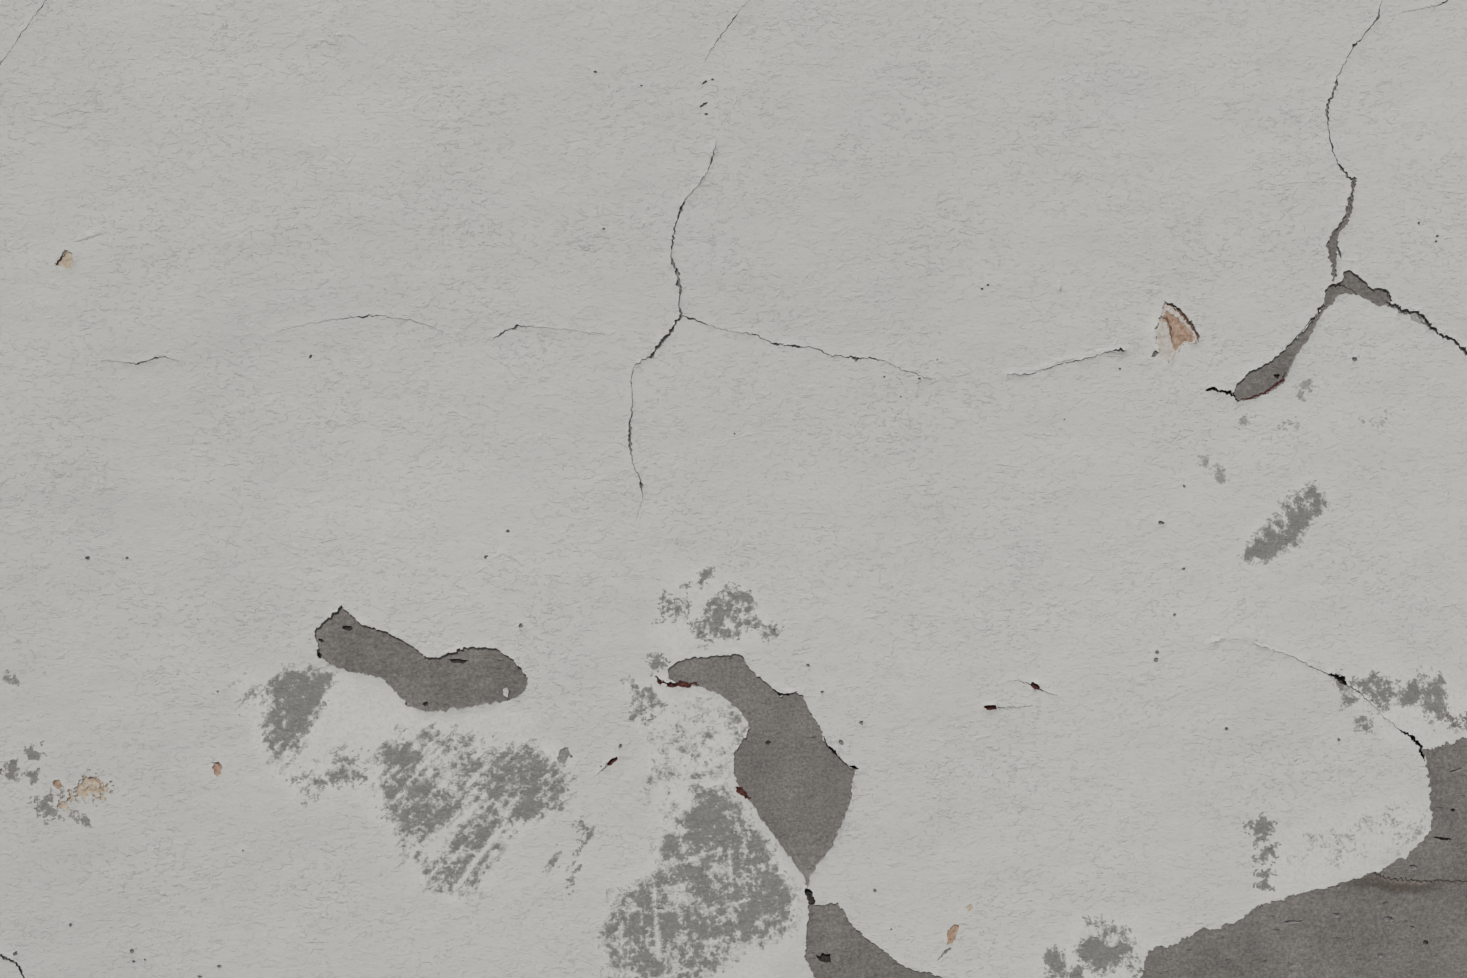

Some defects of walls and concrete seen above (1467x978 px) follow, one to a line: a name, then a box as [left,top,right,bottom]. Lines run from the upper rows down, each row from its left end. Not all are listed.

crack [628,0,932,519]
crack [1206,0,1467,402]
peeling [1151,301,1200,362]
peeling [1236,480,1330,566]
peeling [2,670,21,686]
peeling [0,740,114,828]
peeling [217,605,596,901]
peeling [592,566,973,978]
spalling [1042,666,1467,978]
crack [1215,638,1425,761]
crack [0,954,25,978]